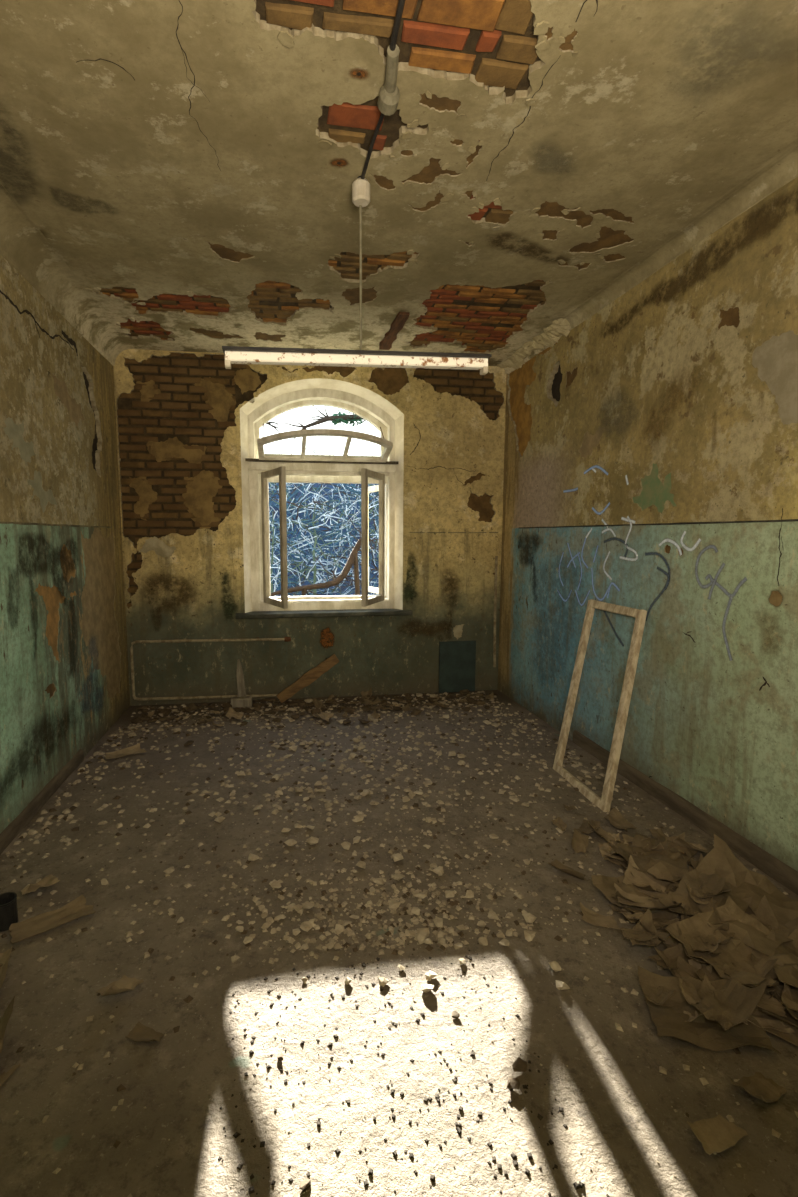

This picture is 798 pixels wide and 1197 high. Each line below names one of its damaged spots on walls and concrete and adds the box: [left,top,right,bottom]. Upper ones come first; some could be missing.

crack [176,1,220,169]
spalling [252,0,634,271]
crack [486,55,561,181]
peeling [205,241,260,263]
crack [0,290,78,356]
spalling [403,280,553,354]
spalling [81,365,102,477]
spalling [85,250,420,614]
spalling [367,339,578,457]
spalling [461,472,496,526]
peeling [35,544,78,662]
peeling [453,624,464,641]